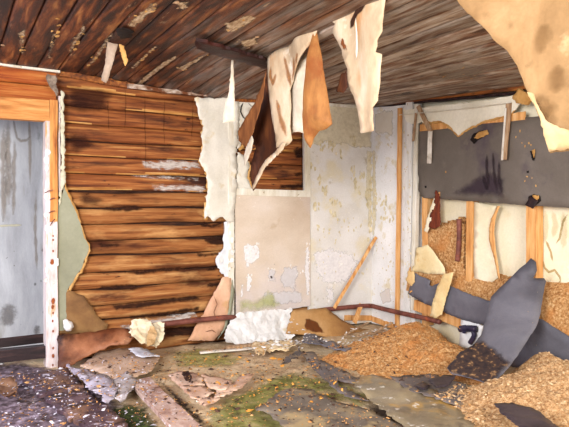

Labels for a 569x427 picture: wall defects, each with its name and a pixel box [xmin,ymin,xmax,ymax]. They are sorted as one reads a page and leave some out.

peeling [129,4,157,27]
peeling [225,15,255,32]
peeling [137,56,177,85]
spalling [428,116,504,137]
damp [462,157,502,195]
peeling [264,107,394,305]
flaking render [215,221,235,277]
peeling [244,242,260,267]
damp [2,306,13,324]